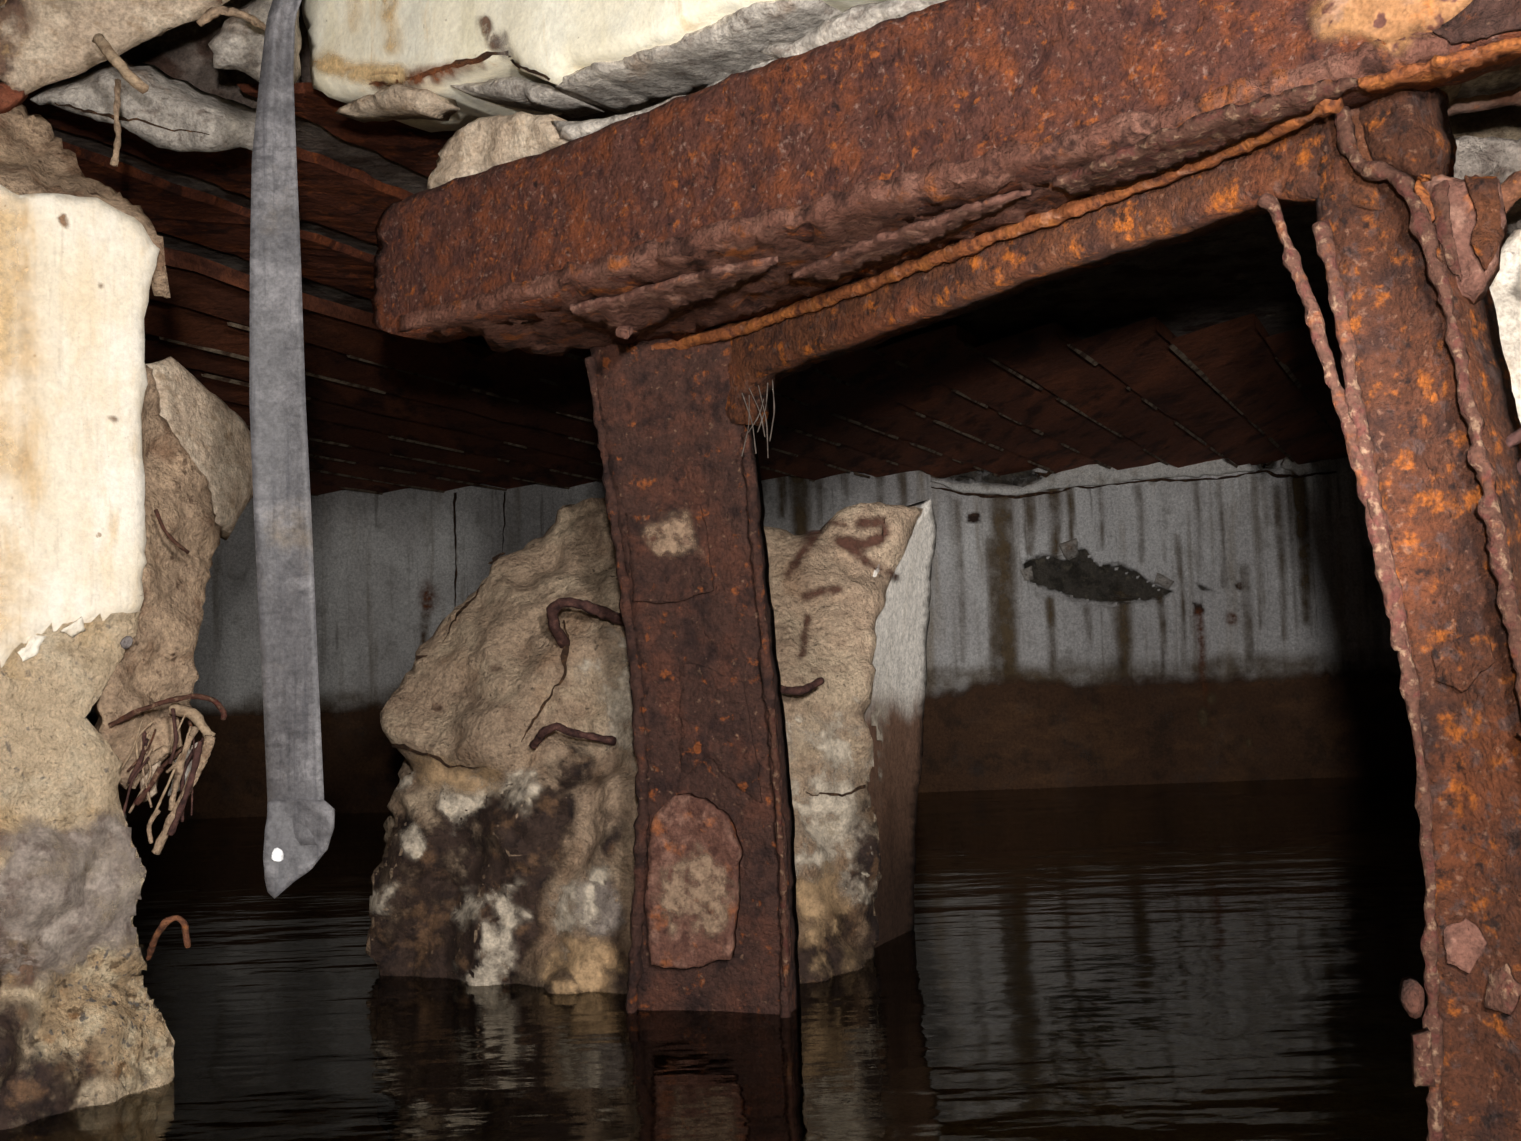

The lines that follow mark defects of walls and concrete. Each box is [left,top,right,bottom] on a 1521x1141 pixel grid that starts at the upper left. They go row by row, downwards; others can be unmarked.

rust [316,39,482,89]
spalling [1501,170,1521,214]
spalling [1506,427,1521,475]
spalling [1020,538,1174,603]
water stain [918,471,1417,802]
spalling [0,611,145,889]
peeling [140,716,198,802]
water stain [0,701,267,986]
water stain [320,700,630,1023]
spalling [0,953,79,1083]
water stain [0,1003,91,1141]
spalling [13,1048,174,1141]